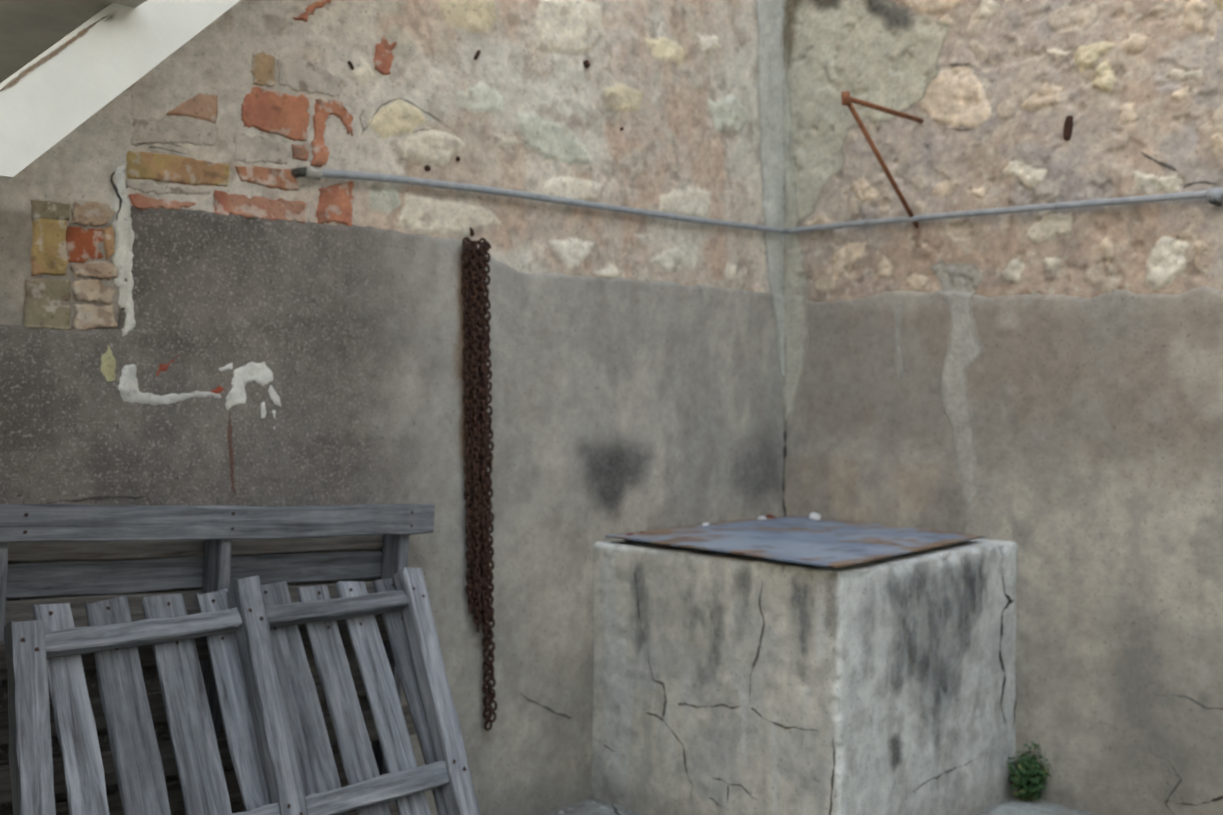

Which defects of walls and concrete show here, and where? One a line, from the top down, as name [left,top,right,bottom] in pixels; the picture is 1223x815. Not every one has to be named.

spalling [292,0,331,22]
spalling [373,36,397,75]
spalling [125,52,354,226]
spalling [22,200,118,330]
peeling [100,346,281,430]
damp [792,584,807,653]
damp [895,565,983,699]
crack [1000,558,1017,738]
crack [634,572,835,815]
damp [892,739,901,766]
crack [903,755,980,800]
crack [1155,754,1223,812]